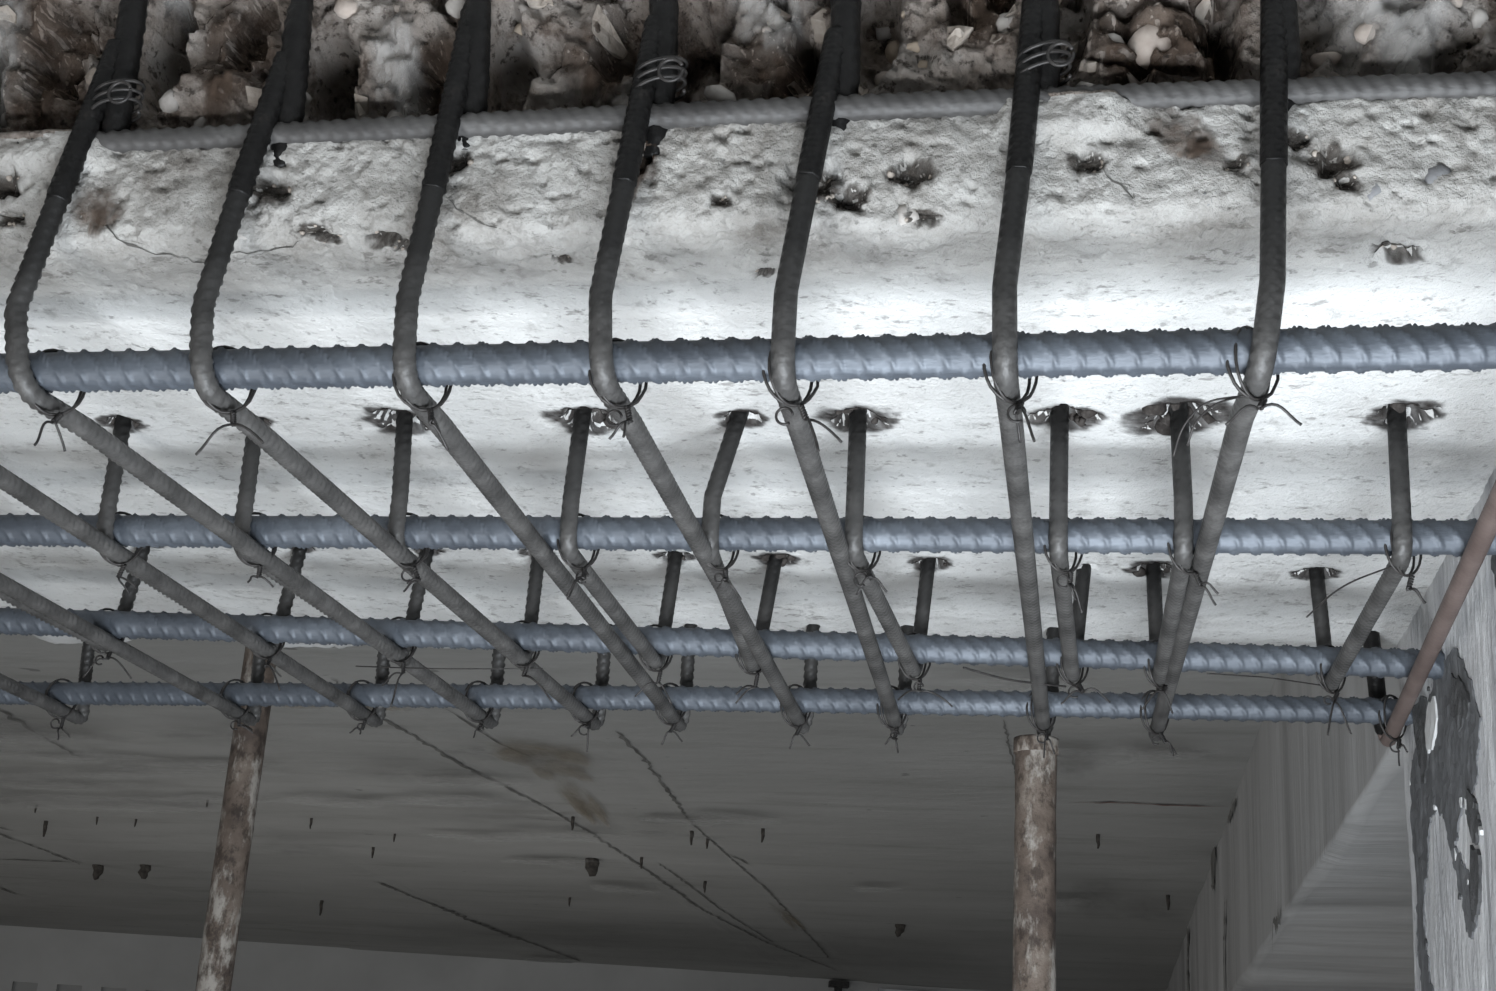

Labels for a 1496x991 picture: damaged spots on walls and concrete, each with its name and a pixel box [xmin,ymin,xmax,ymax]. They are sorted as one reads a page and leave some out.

spalling [0,0,121,144]
spalling [96,0,291,153]
spalling [269,0,466,145]
spalling [449,0,650,175]
spalling [649,0,831,130]
spalling [833,0,1022,122]
spalling [1067,153,1108,173]
spalling [1039,0,1260,110]
spalling [1223,154,1250,172]
spalling [1288,0,1496,201]
crack [0,827,80,895]
crack [366,706,839,972]